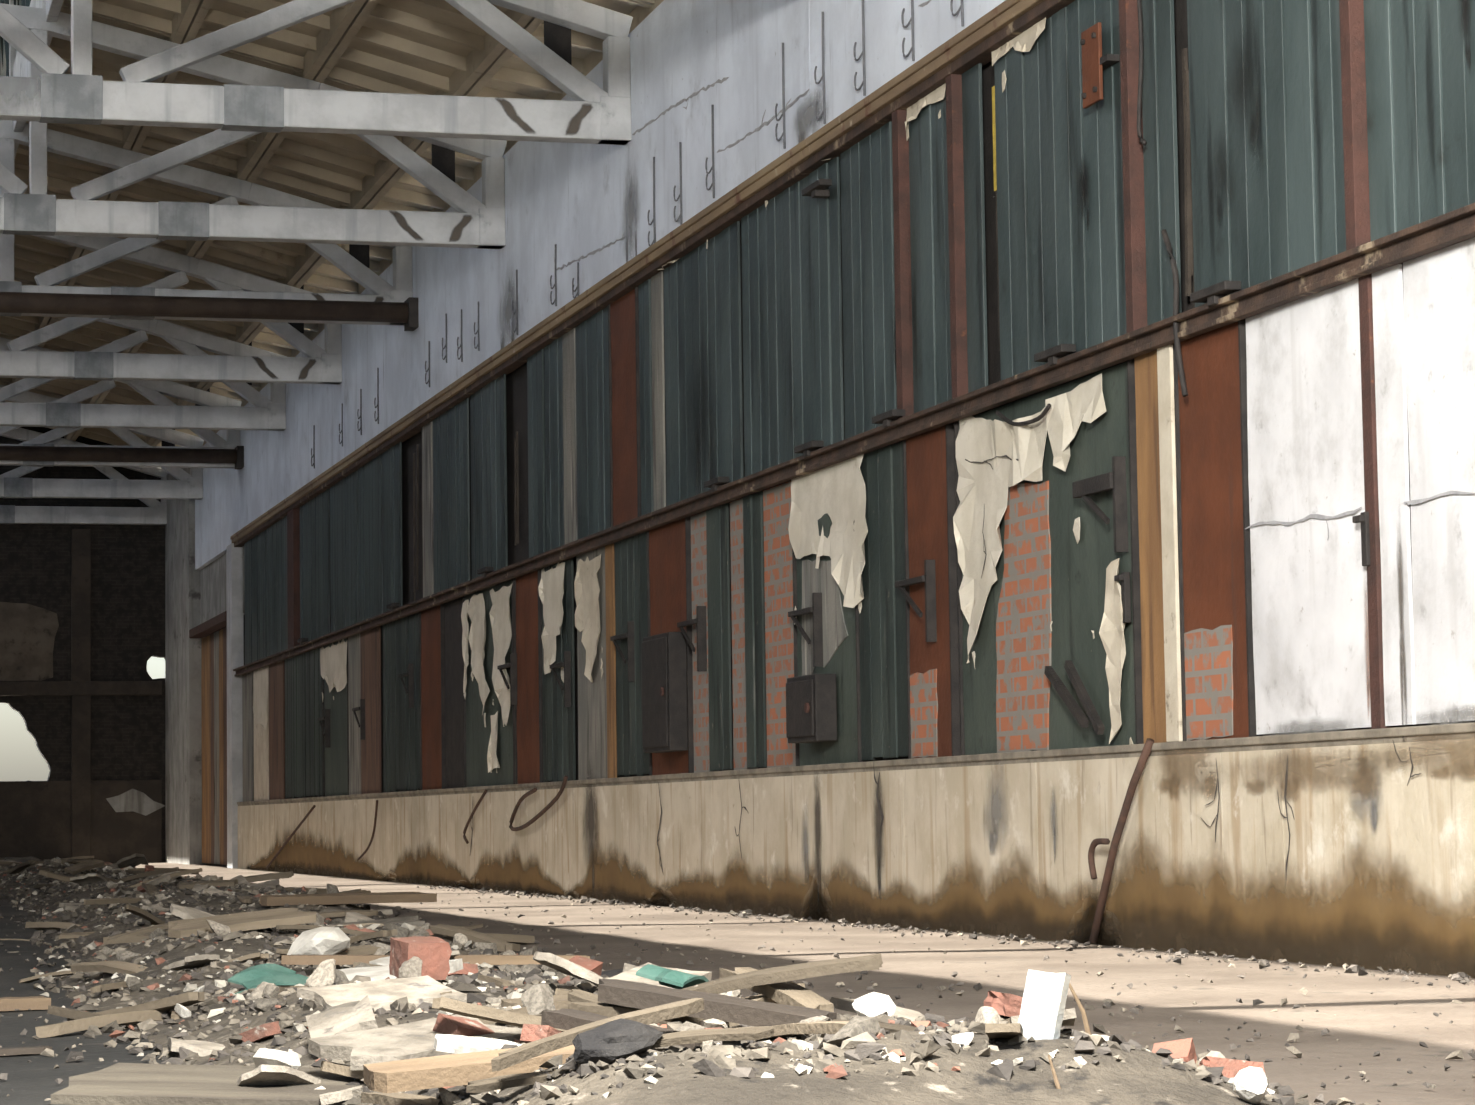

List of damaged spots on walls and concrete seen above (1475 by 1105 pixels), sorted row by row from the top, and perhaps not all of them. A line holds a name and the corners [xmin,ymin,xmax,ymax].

peeling [461,583,513,773]
peeling [538,554,603,683]
peeling [788,454,868,614]
peeling [953,373,1106,753]
peeling [1091,558,1133,745]
crack [1245,507,1362,540]
water stain [1283,722,1338,735]
crack [1404,491,1475,505]
water stain [1441,708,1475,725]
water stain [247,776,1475,979]